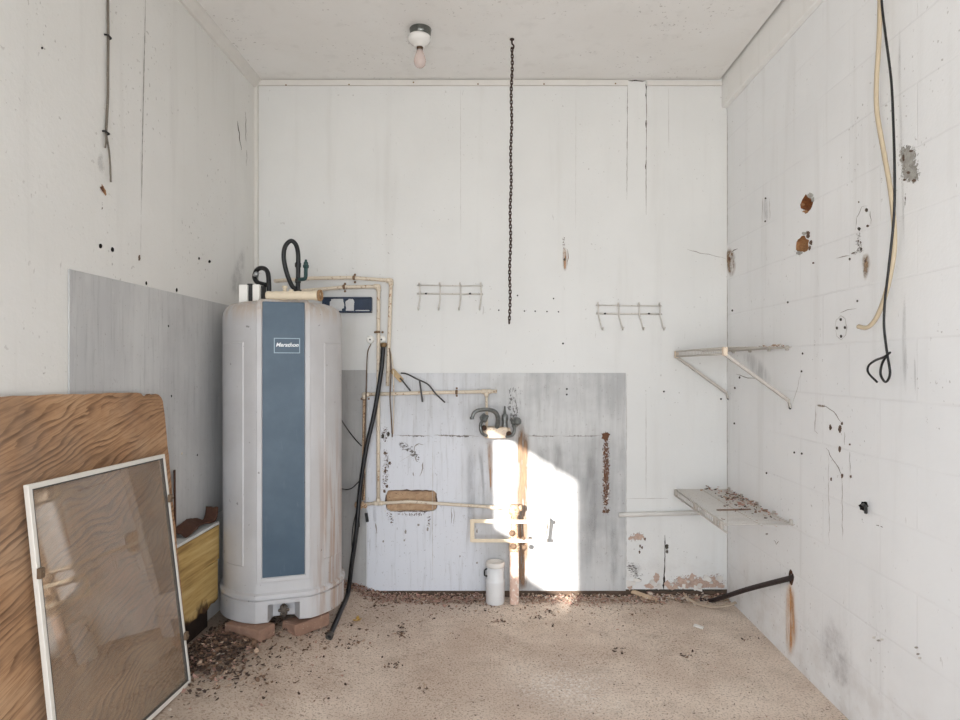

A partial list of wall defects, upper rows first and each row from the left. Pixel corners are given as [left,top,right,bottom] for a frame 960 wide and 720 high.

spalling [898,145,921,183]
rust [601,432,610,513]
flaking render [626,532,726,592]